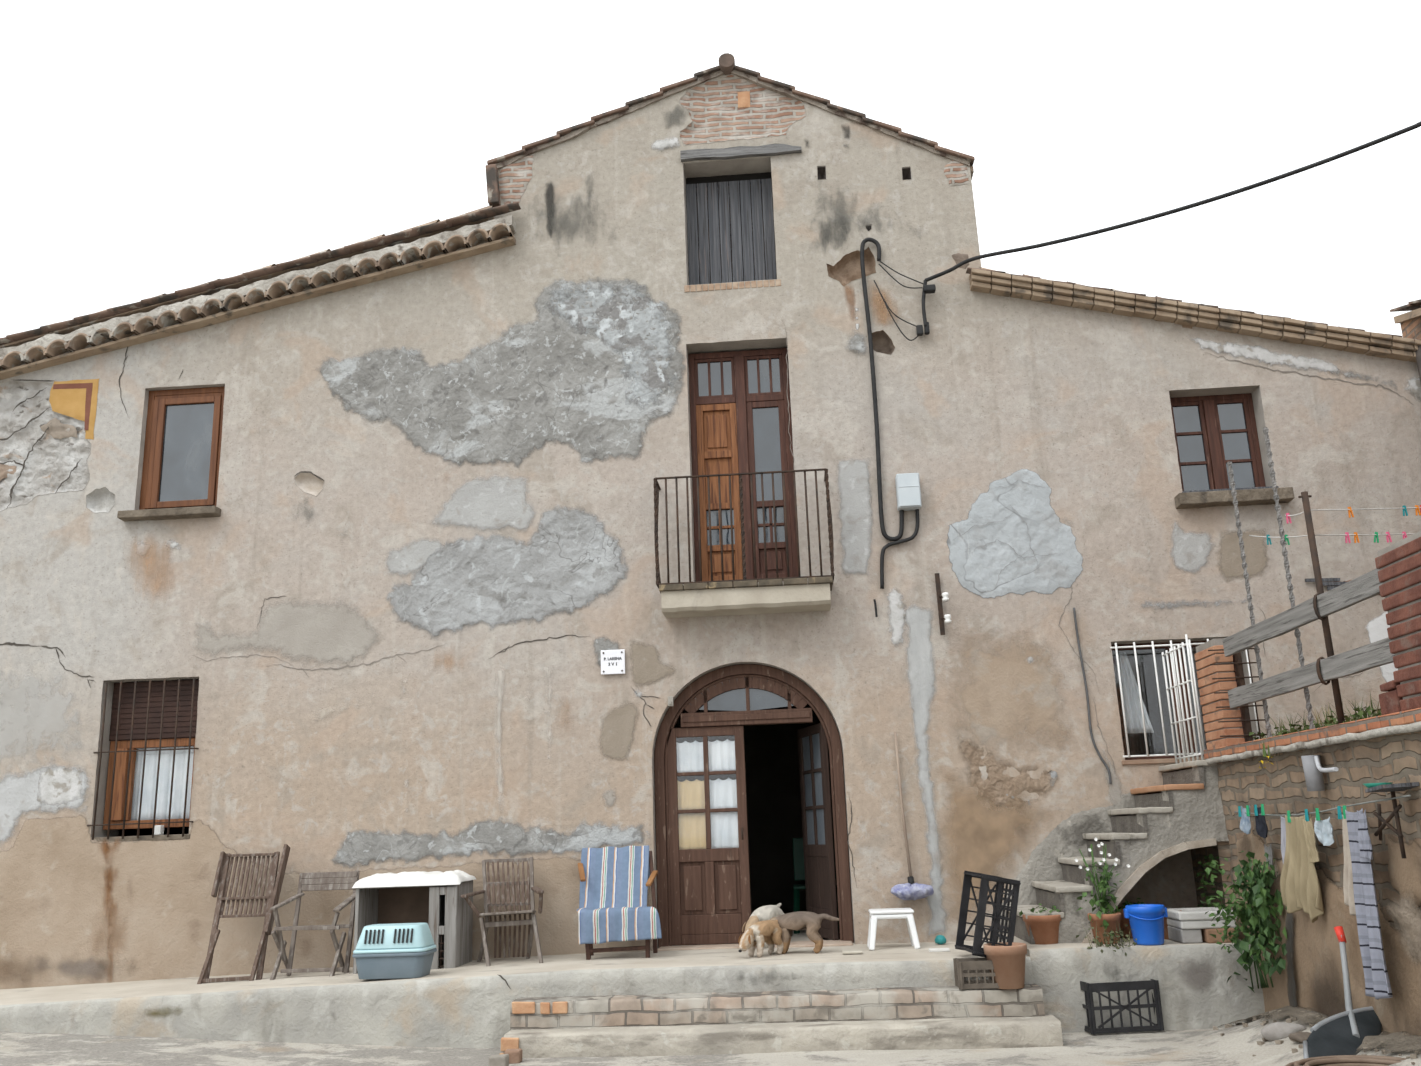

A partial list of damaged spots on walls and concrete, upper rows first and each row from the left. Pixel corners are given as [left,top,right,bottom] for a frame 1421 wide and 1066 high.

flaking render [652,74,806,149]
flaking render [0,379,115,513]
crack [0,642,94,688]
crack [192,596,443,677]
water stain [888,589,1032,934]
flaking render [962,741,1058,808]
peeling [0,767,652,990]